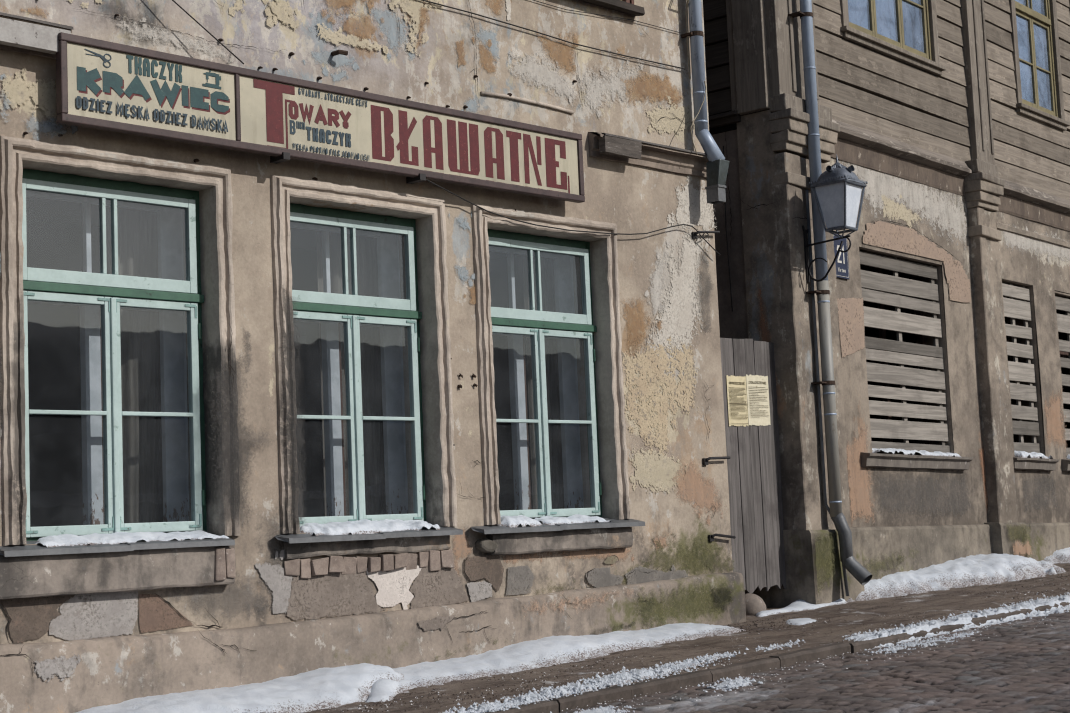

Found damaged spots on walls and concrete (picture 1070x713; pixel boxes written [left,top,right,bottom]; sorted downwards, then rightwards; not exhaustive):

peeling [117,18,236,63]
peeling [262,0,443,81]
peeling [486,0,512,20]
peeling [456,29,695,135]
peeling [621,240,700,498]
damp [217,335,264,525]
spalling [0,595,74,644]
spalling [139,593,194,633]
peeling [255,531,688,631]